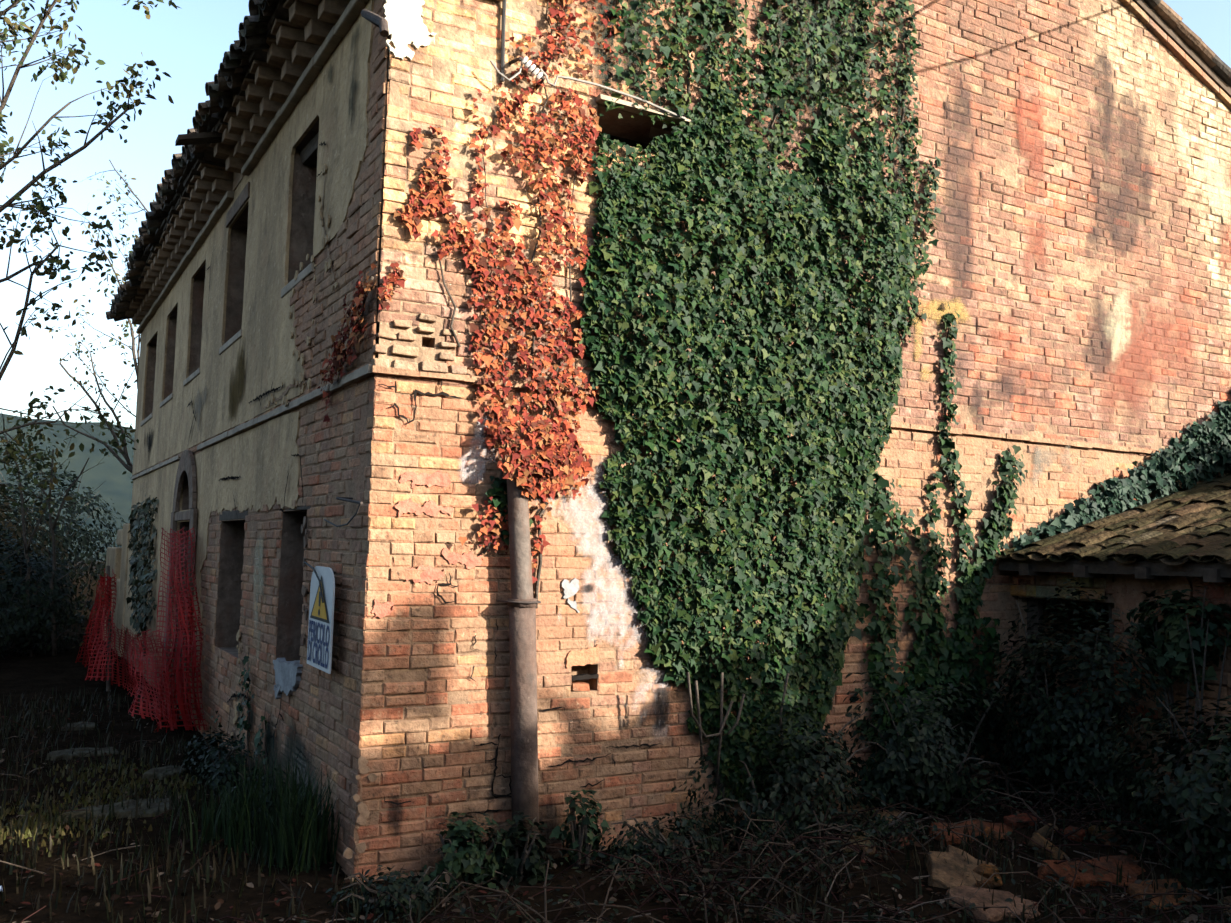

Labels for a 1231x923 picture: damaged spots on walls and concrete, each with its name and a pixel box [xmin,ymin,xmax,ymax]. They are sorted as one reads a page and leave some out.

peeling [383,0,437,61]
leakage [1095,58,1142,240]
leakage [947,155,970,283]
crack [249,382,283,405]
crack [378,379,462,427]
spalling [566,644,600,691]